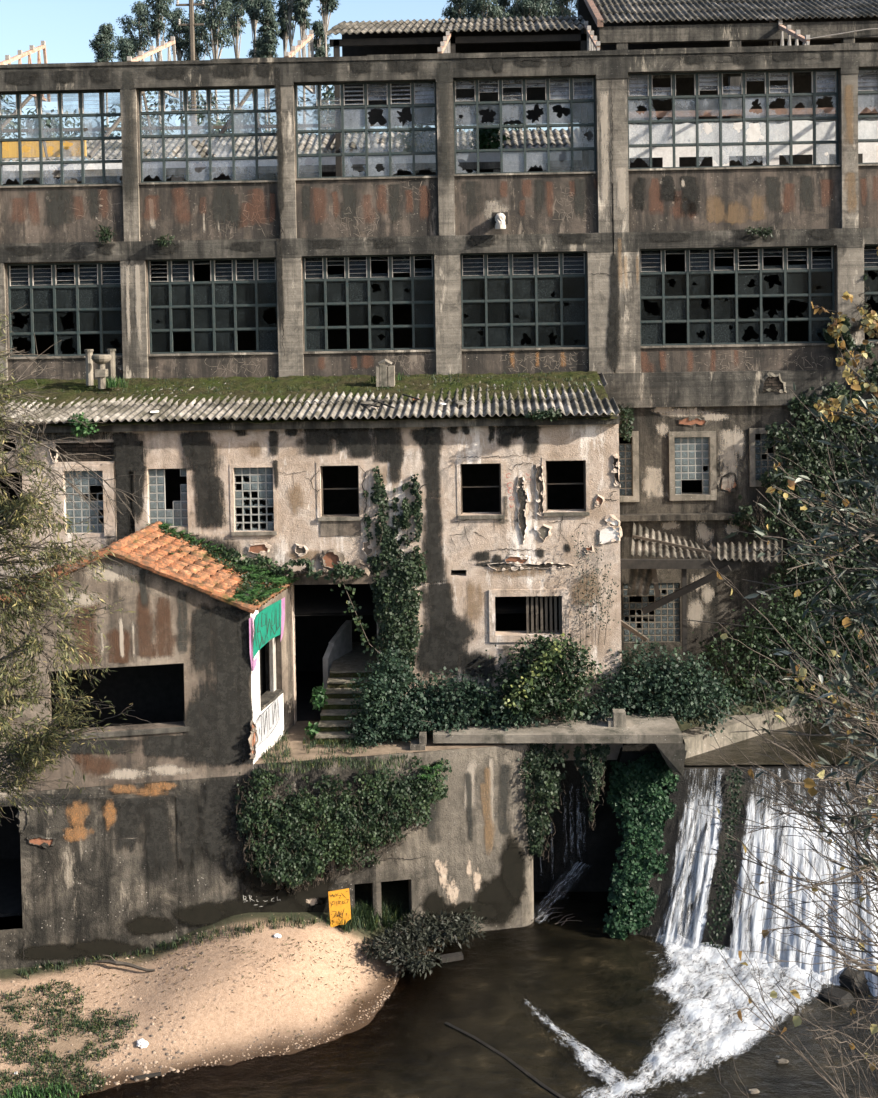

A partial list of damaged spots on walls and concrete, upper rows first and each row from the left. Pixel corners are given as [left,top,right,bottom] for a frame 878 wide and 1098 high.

leakage [599,92,645,212]
leakage [23,432,147,546]
leakage [180,431,241,554]
leakage [234,426,511,684]
flaking render [584,494,623,555]
flaking render [611,453,621,488]
flaking render [644,468,663,497]
flaking render [654,407,744,495]
leakage [0,564,332,960]
spalling [435,859,459,904]
leakage [419,759,526,926]
spalling [466,860,481,891]